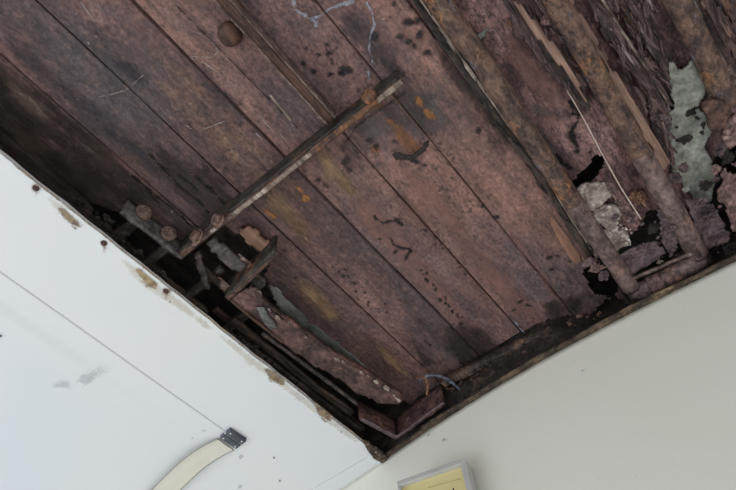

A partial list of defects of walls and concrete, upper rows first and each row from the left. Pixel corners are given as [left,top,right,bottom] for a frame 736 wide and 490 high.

leakage [366,2,379,80]
leakage [396,18,422,49]
leakage [328,65,352,77]
spalling [668,60,715,203]
rust [119,70,406,260]
spalling [59,208,79,229]
spalling [577,181,631,251]
peeling [546,216,581,271]
spalling [136,269,157,289]
spalling [265,369,284,385]
spalling [314,404,331,422]
spalling [363,440,388,464]